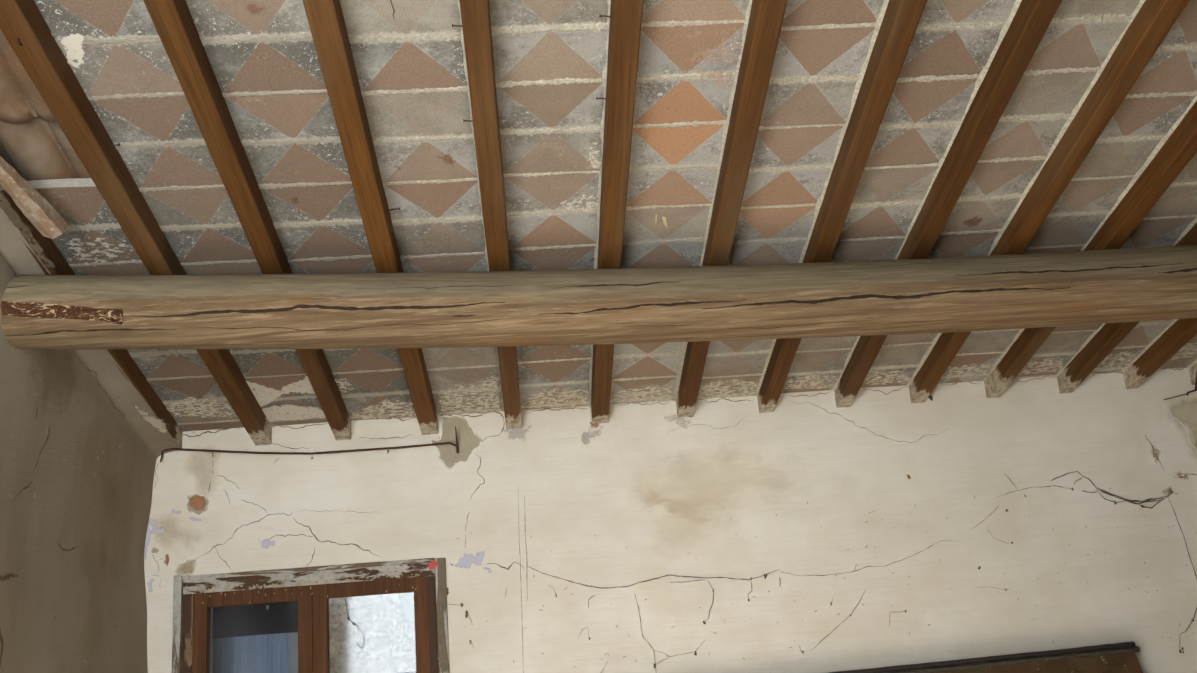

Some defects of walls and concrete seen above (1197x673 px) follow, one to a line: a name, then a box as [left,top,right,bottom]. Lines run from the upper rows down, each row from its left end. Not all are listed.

spalling [429,415,483,470]
crack [199,475,381,571]
crack [361,412,524,570]